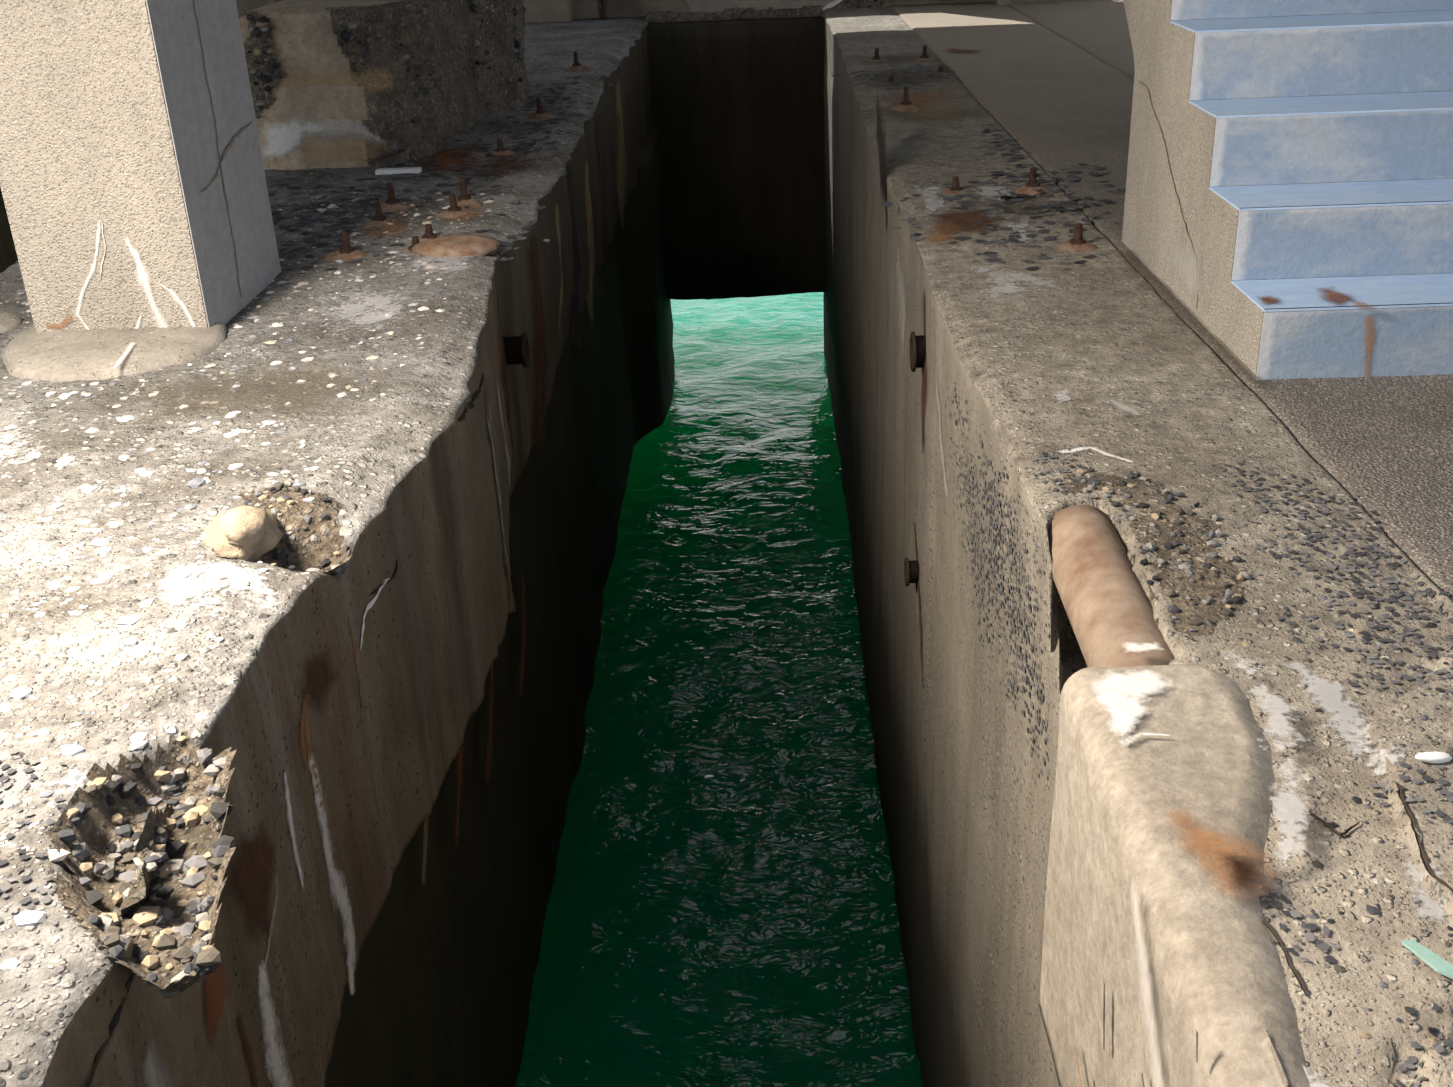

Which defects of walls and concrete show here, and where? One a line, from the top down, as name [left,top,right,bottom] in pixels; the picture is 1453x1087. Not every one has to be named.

spalling [242,8,287,119]
spalling [646,0,895,23]
damp [113,239,195,368]
corrosion [1323,289,1374,377]
spalling [239,480,351,575]
spalling [0,730,237,1087]
efflorescence [303,705,355,994]
corrosion [1176,815,1258,891]
crack [1258,886,1339,997]
crack [1394,780,1453,893]
efflorescence [259,937,290,1087]
crack [1381,997,1453,1087]